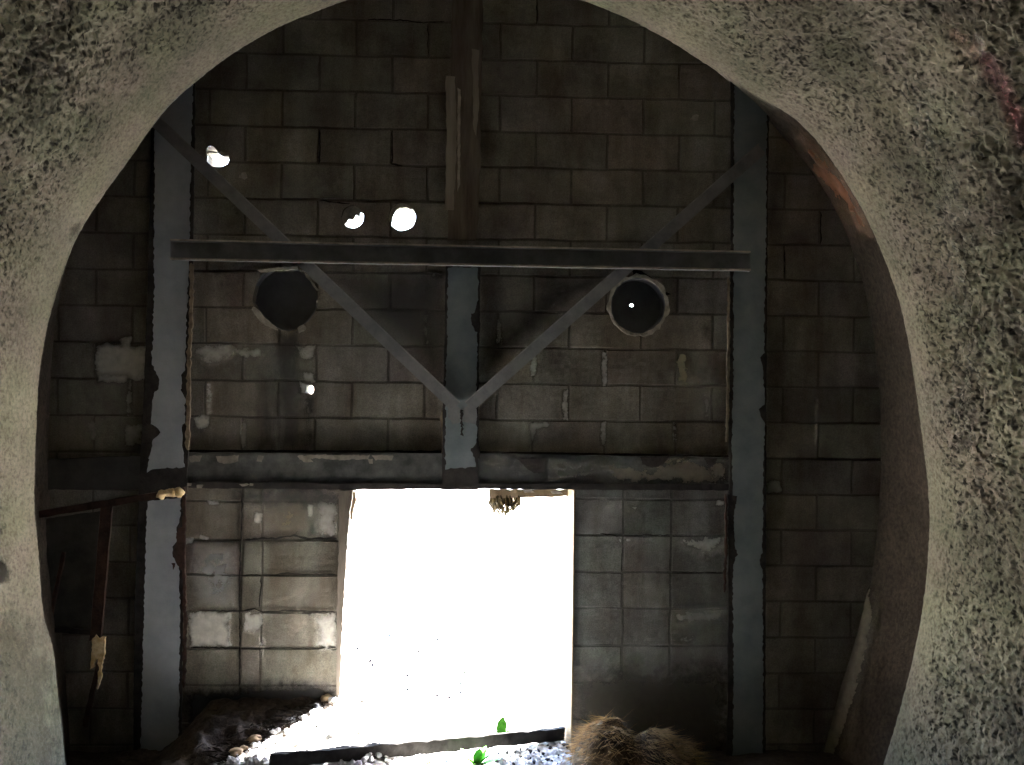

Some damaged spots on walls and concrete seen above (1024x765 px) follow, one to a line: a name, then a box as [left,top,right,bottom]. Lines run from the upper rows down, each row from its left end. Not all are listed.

corrosion [805,145,866,229]
peeling [142,370,160,472]
peeling [550,461,596,494]
peeling [608,457,726,484]
peeling [171,527,186,570]
damp [190,612,231,647]
damp [245,614,262,631]
damp [318,615,336,646]